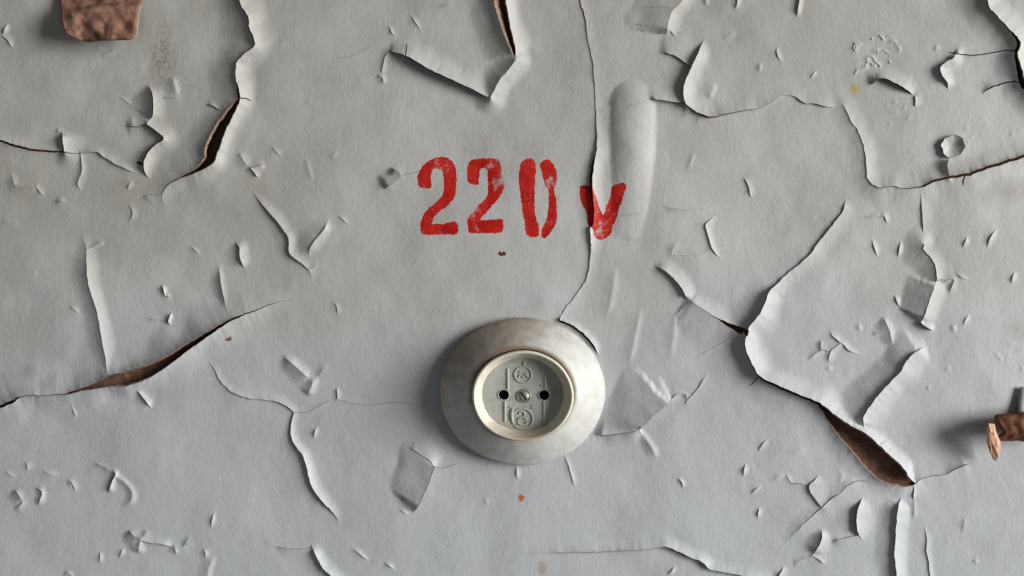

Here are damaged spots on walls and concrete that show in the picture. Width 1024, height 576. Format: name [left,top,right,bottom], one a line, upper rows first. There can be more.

peeling [60,0,143,43]
crack [0,0,269,219]
crack [0,226,428,530]
crack [557,0,1024,576]
peeling [986,387,1024,461]